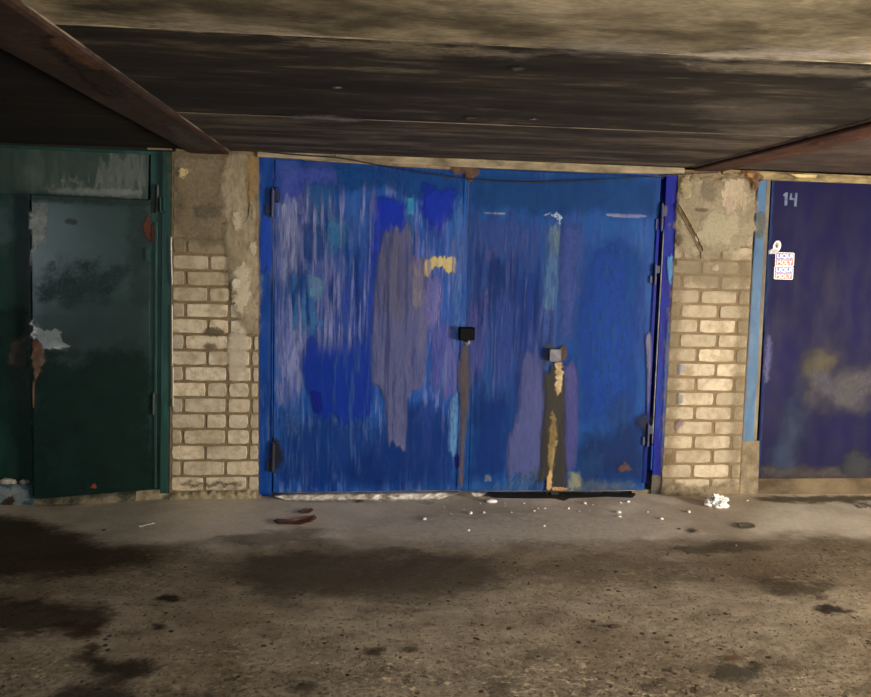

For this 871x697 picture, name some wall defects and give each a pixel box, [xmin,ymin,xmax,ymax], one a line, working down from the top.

leakage [145,22,529,56]
leakage [684,48,871,87]
spalling [680,175,692,199]
peeling [29,202,48,264]
spalling [232,262,251,314]
peeling [30,320,70,349]
corrosion [7,330,46,407]
corrosion [458,341,470,487]